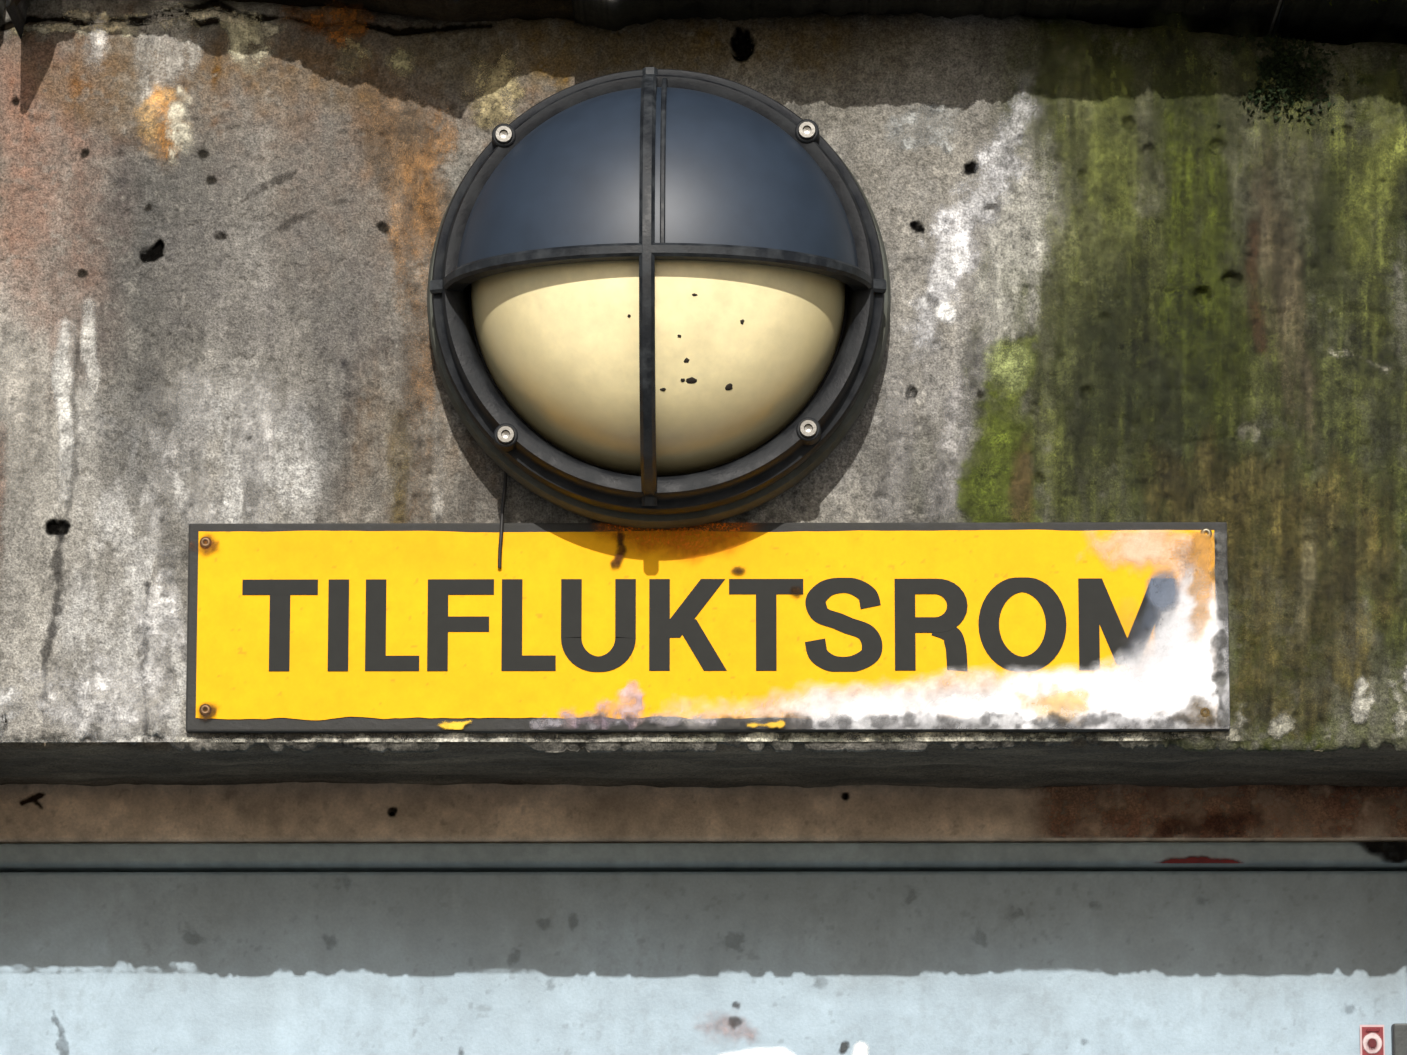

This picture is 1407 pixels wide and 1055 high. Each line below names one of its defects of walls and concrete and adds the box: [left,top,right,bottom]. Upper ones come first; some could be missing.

rust [140,87,191,159]
water stain [890,104,953,150]
water stain [1364,114,1407,208]
water stain [917,100,1068,522]
water stain [1081,118,1312,499]
rust [1036,784,1407,838]